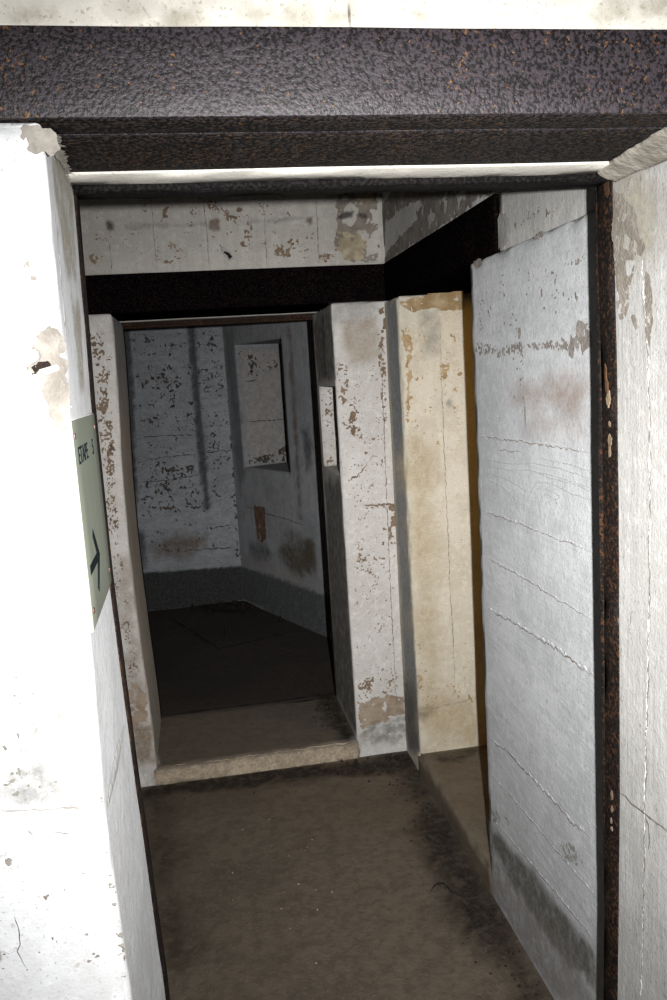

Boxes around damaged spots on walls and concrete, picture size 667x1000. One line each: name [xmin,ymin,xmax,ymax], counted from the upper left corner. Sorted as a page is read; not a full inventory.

spalling [21,124,62,156]
peeling [184,190,492,263]
peeling [400,291,464,312]
peeling [475,275,591,381]
peeling [604,181,653,347]
peeling [90,333,129,603]
crack [489,513,587,551]
leakage [144,482,430,753]
crack [489,558,591,620]
crack [487,608,593,677]
crack [622,294,666,992]
leakage [492,835,594,981]